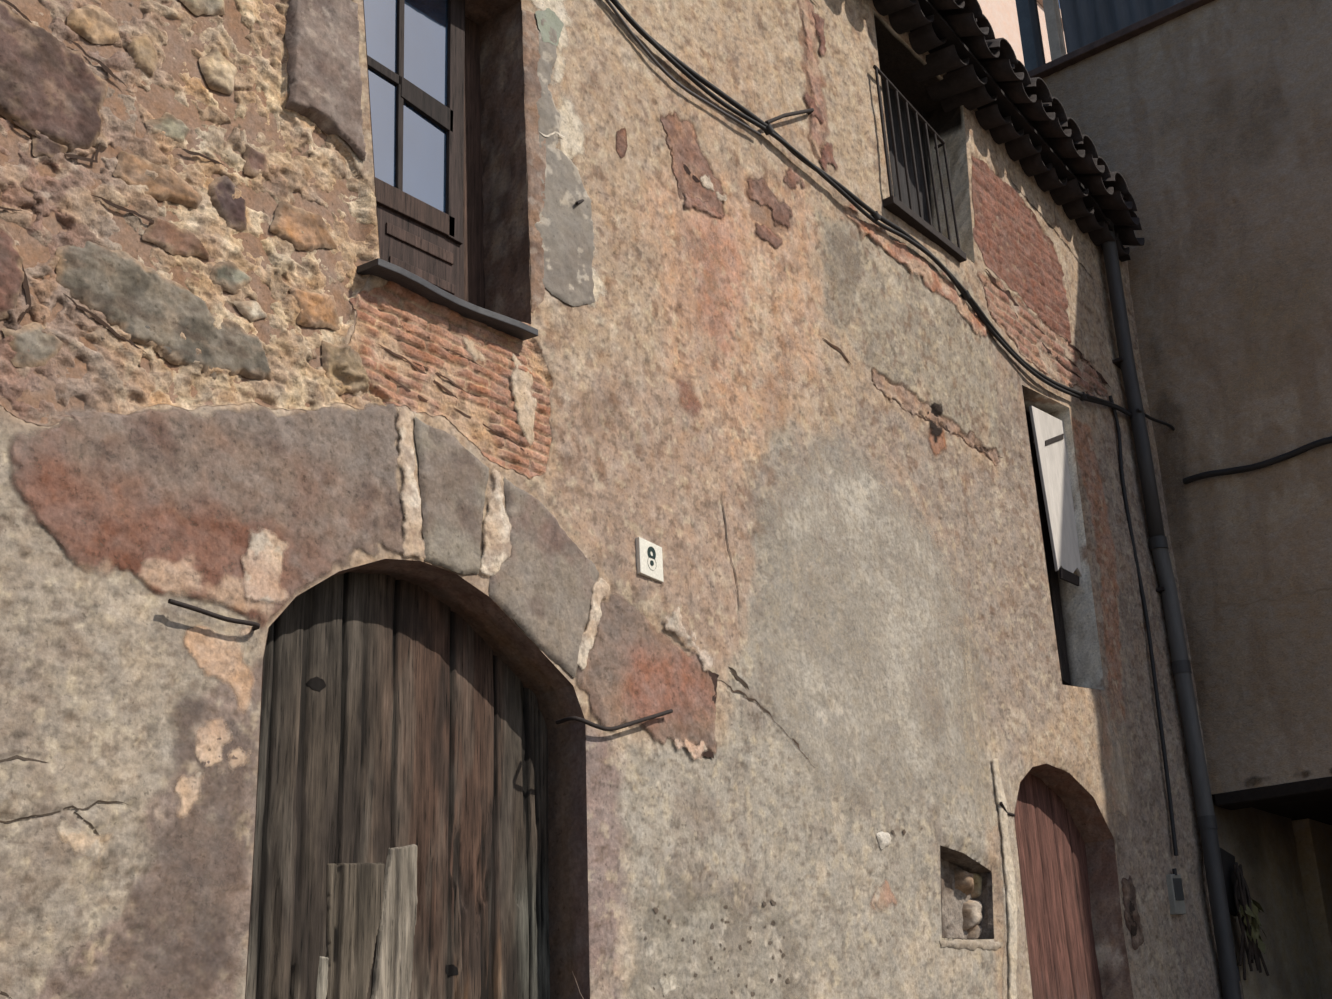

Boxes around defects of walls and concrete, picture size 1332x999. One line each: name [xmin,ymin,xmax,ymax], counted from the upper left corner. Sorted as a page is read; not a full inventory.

peeling [532,0,584,159]
spalling [0,0,553,479]
flaking render [661,112,727,218]
flaking render [747,167,805,248]
flaking render [842,156,1111,398]
flaking render [184,626,253,710]
flaking render [665,607,719,704]
crack [0,755,49,763]
flaking render [175,719,246,816]
flaking render [675,739,714,759]
crack [719,667,814,767]
crack [0,800,131,836]